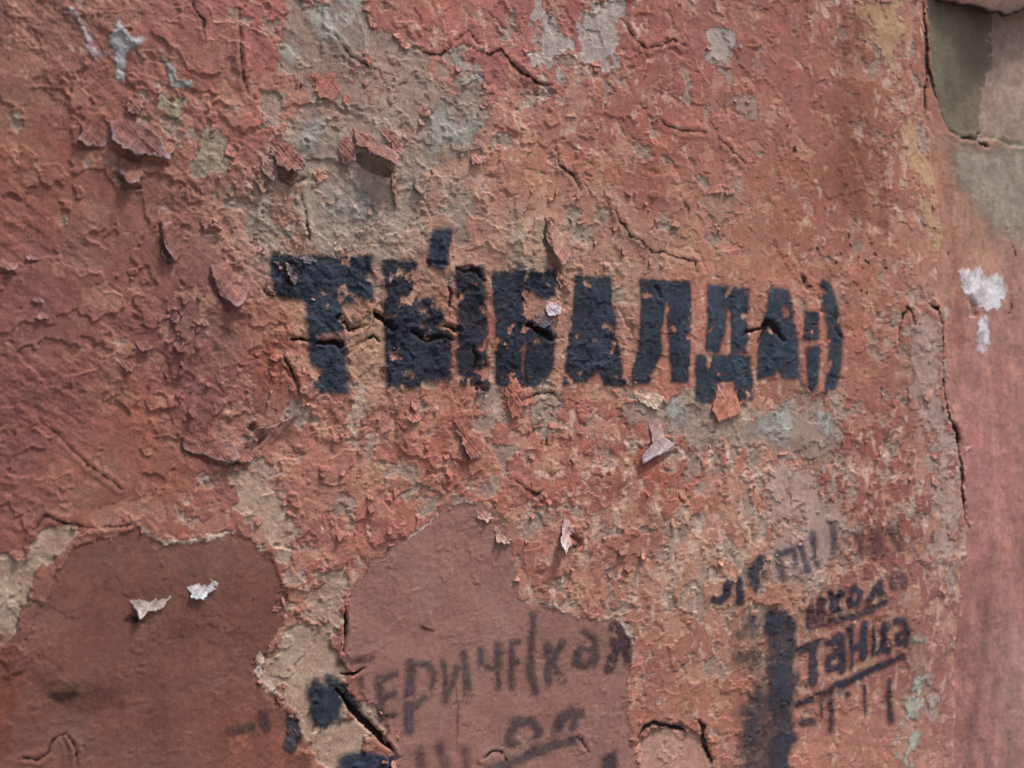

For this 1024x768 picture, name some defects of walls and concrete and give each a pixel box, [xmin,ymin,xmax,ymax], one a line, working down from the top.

crack [420,30,551,86]
peeling [515,0,635,84]
peeling [77,93,178,184]
flaking render [896,0,1024,255]
peeling [176,0,497,568]
crack [899,305,967,522]
peeling [617,378,870,602]
peeling [0,524,80,650]
peeling [129,596,171,620]
peeling [187,579,218,600]
crack [335,609,393,750]
crack [640,720,713,763]